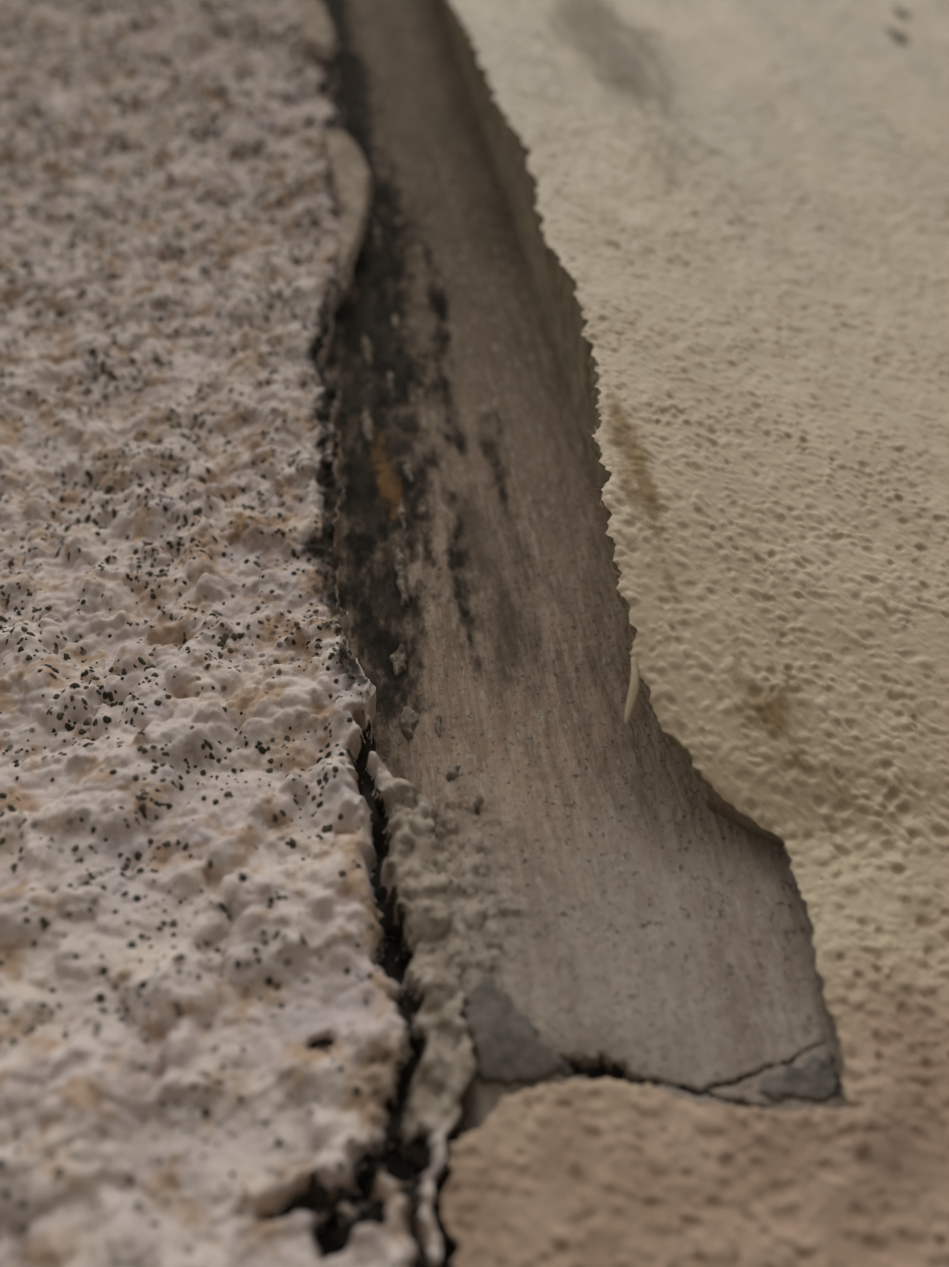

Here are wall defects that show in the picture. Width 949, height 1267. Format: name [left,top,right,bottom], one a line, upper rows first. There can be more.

damp [0,0,508,861]
spalling [298,0,853,1267]
damp [0,793,31,875]
damp [23,906,51,947]
damp [29,987,62,1032]
damp [95,954,148,1035]
damp [68,817,241,980]
damp [252,929,281,963]
damp [267,891,288,909]
crack [266,719,431,1267]
damp [344,959,385,982]
crack [558,1044,824,1109]